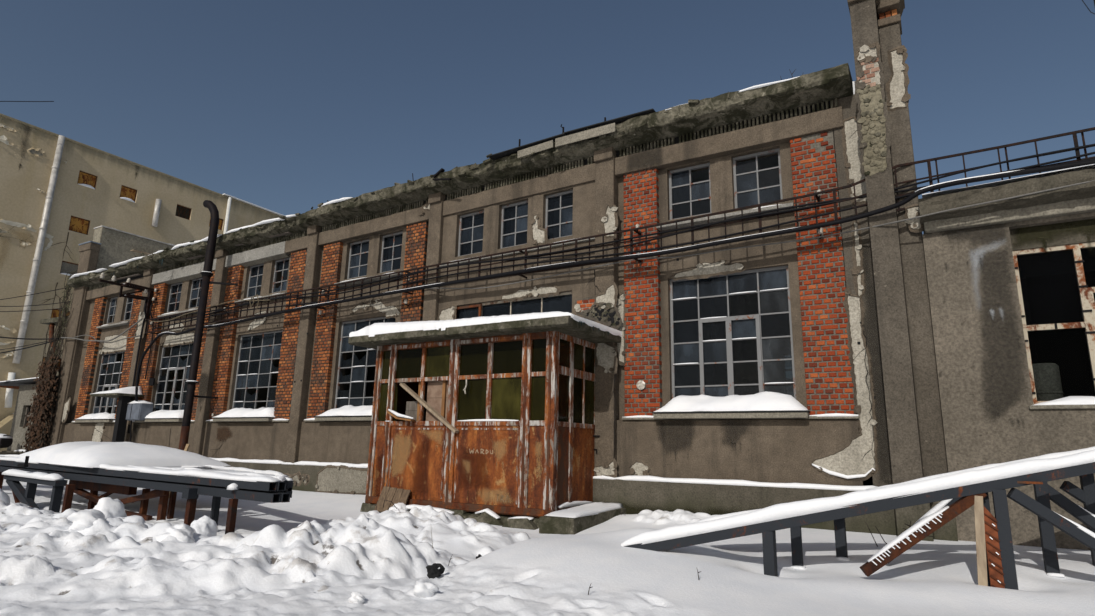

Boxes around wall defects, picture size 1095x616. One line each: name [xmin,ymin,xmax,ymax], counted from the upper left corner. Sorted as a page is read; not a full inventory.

spalling [841,41,911,206]
peeling [530,213,548,246]
peeling [601,203,618,239]
peeling [670,258,745,281]
peeling [349,297,401,319]
peeling [501,284,560,301]
leakage [946,219,1095,415]
peeling [809,221,879,481]